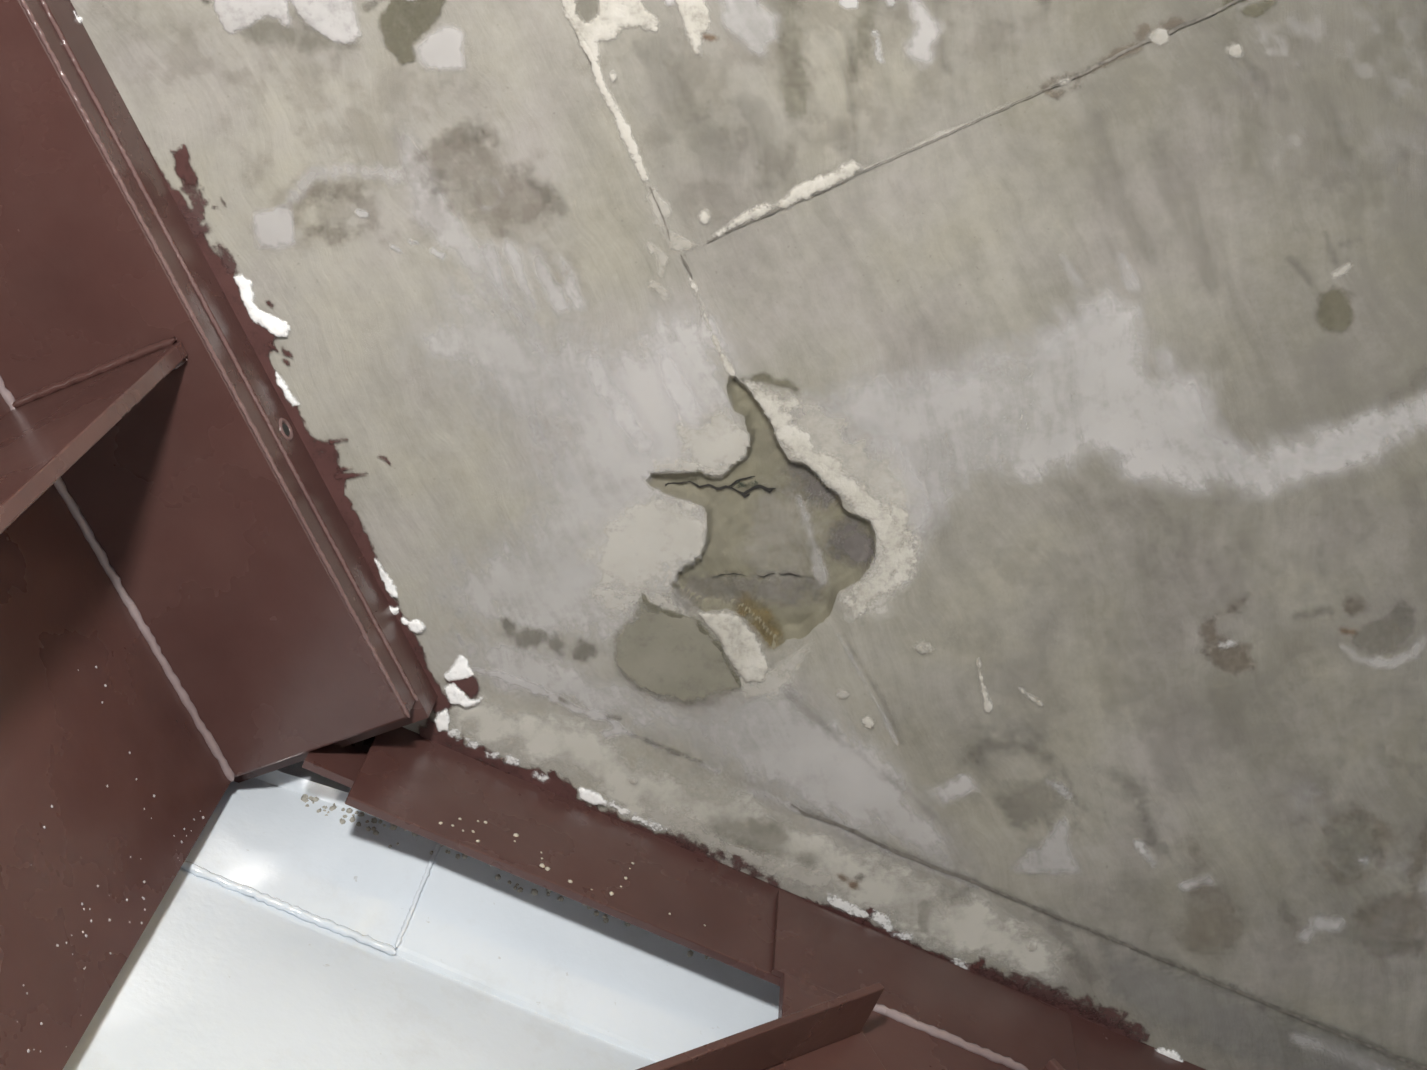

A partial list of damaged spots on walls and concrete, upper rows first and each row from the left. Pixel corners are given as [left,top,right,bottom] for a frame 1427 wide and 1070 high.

peeling [204,0,463,68]
damp [255,208,293,247]
damp [1318,264,1352,331]
crack [665,476,776,498]
spalling [646,375,877,650]
damp [746,299,1427,621]
damp [406,143,1076,978]